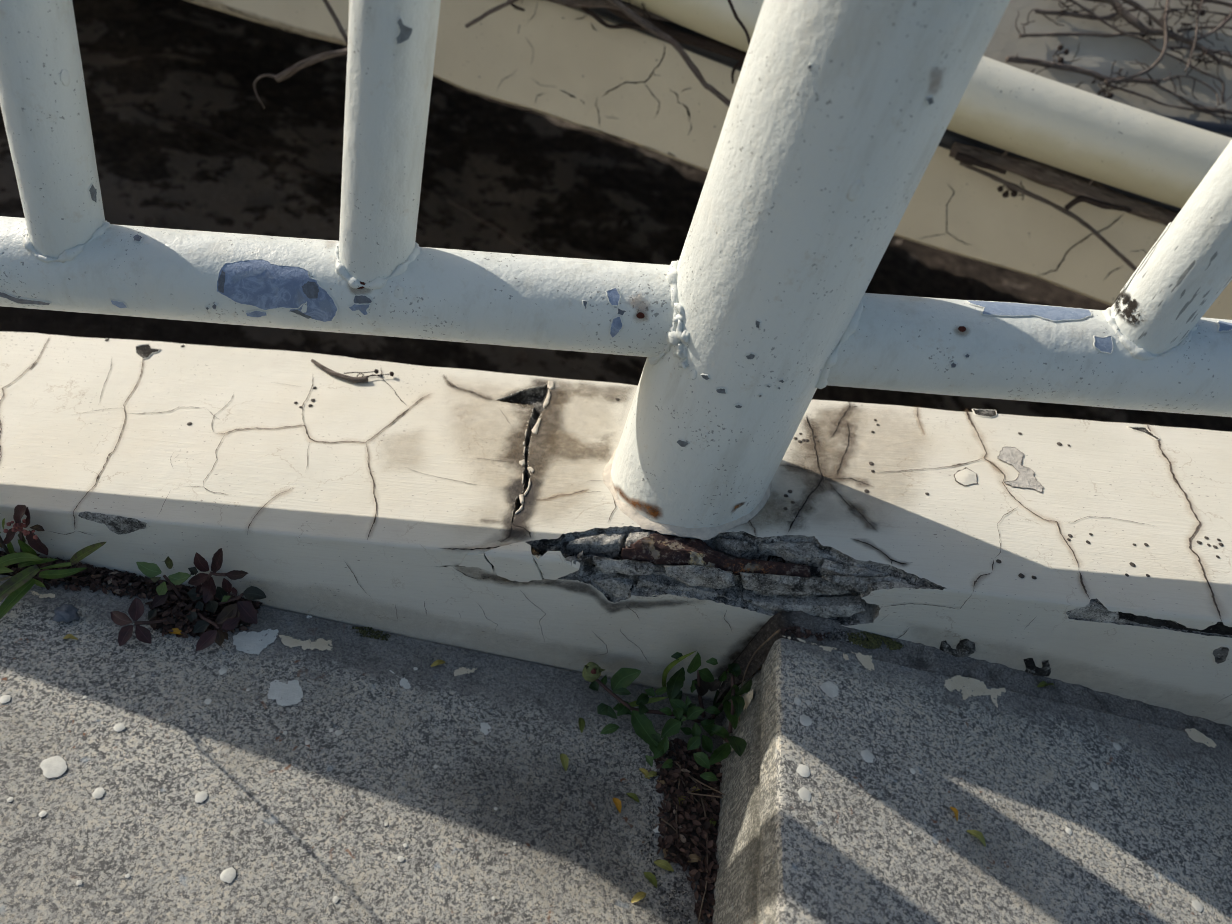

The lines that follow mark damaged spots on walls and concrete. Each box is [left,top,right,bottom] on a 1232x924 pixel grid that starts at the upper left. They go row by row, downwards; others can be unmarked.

peeling [205,259,373,322]
peeling [965,300,1092,322]
crack [0,338,49,460]
peeling [77,511,149,536]
crack [49,360,508,540]
corrosion [615,488,660,518]
crack [783,405,1144,637]
peeling [997,447,1043,492]
crack [1147,424,1222,621]
crack [436,524,546,641]
spalling [531,529,935,620]
spalling [1066,600,1232,665]